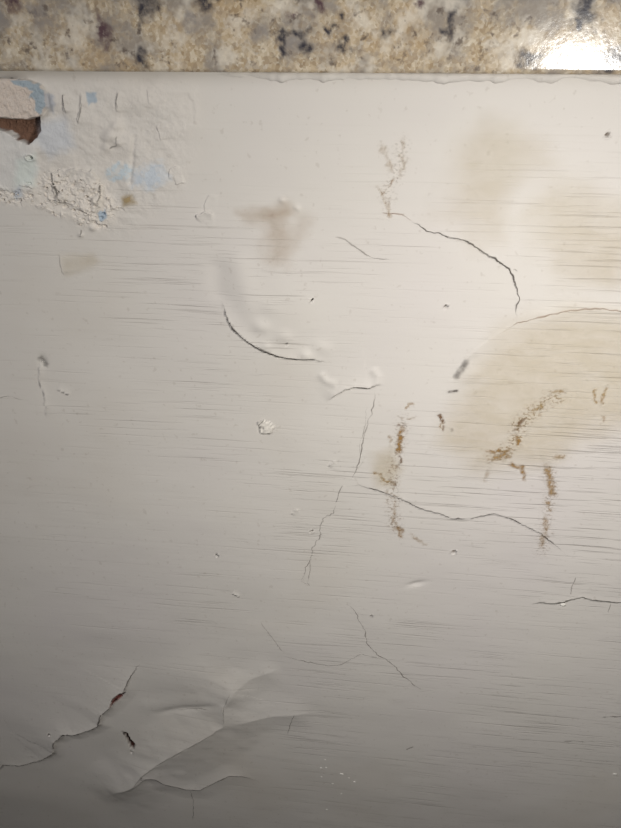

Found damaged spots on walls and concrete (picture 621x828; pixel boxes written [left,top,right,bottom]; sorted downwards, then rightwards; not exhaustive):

spalling [0,78,202,242]
crack [420,226,520,306]
rust [491,391,562,474]
peeling [21,654,261,799]